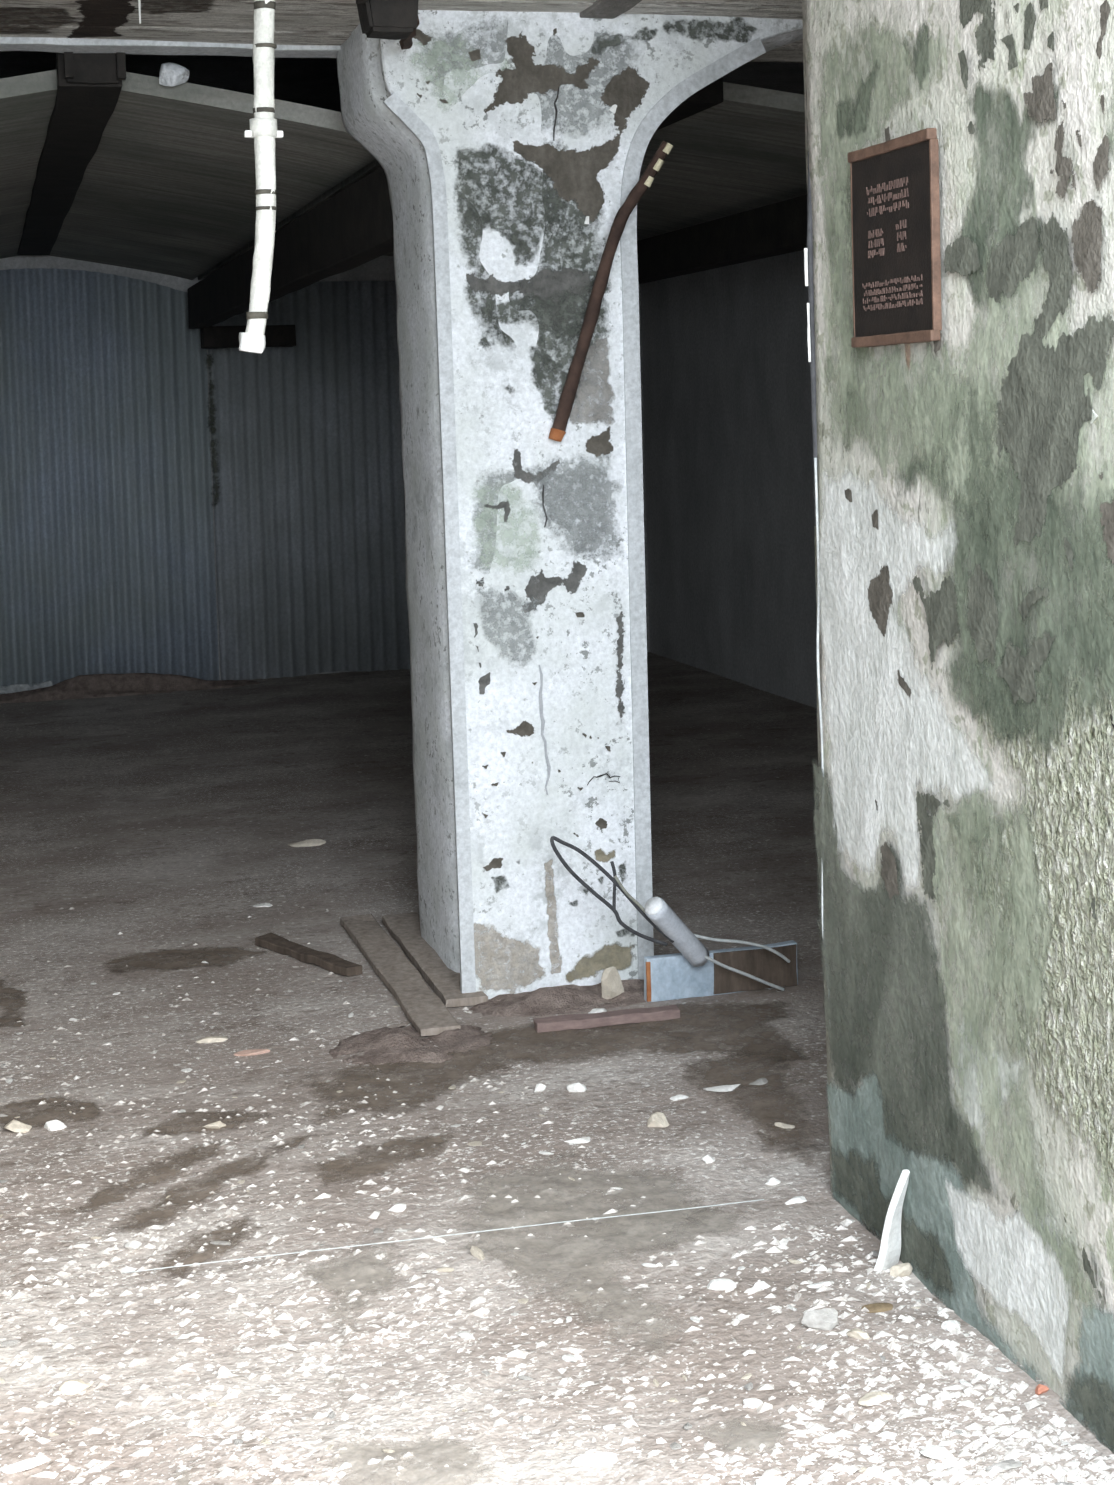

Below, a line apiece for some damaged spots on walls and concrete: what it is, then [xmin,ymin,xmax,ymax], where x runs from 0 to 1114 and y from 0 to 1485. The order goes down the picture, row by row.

spalling [68,0,136,38]
peeling [944,0,1114,548]
spalling [512,449,560,484]
peeling [1100,500,1114,564]
damp [615,611,625,718]
peeling [483,858,503,871]
peeling [595,848,615,862]
damp [474,860,626,994]
damp [813,473,1114,1453]
damp [311,1002,812,1160]
damp [78,1111,307,1230]
damp [462,1162,738,1351]